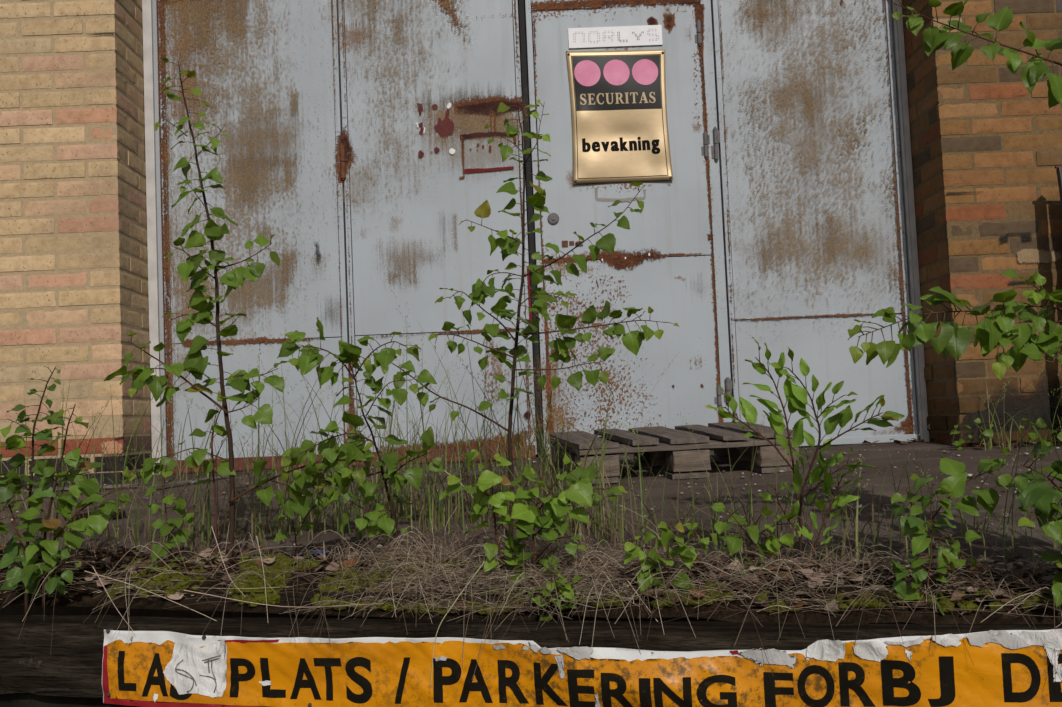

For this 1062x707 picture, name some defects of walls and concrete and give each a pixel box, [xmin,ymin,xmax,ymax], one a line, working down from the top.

corrosion [328,0,914,451]